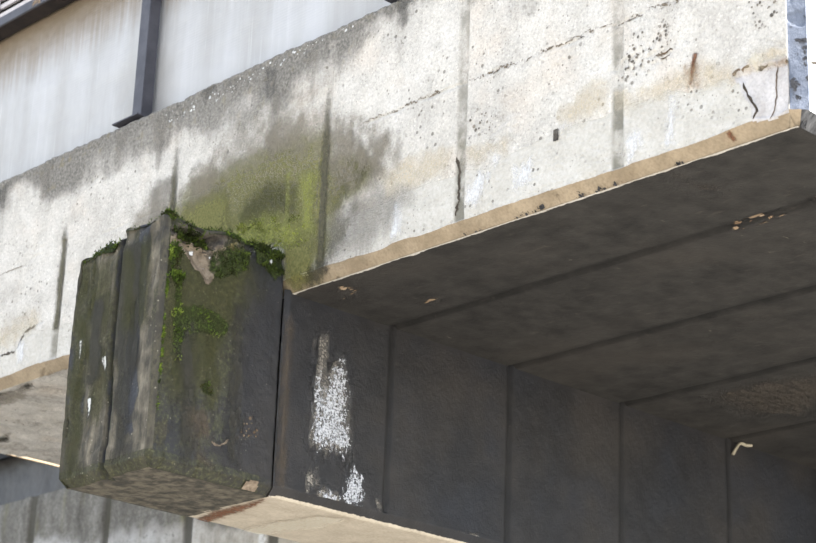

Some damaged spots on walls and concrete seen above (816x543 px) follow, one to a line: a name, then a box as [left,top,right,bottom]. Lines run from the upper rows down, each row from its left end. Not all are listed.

corrosion [689,53,697,85]
crack [363,90,440,124]
leakage [305,109,329,286]
crack [454,157,462,216]
spalling [170,223,228,285]
leakage [309,337,351,458]
leakage [342,466,364,504]